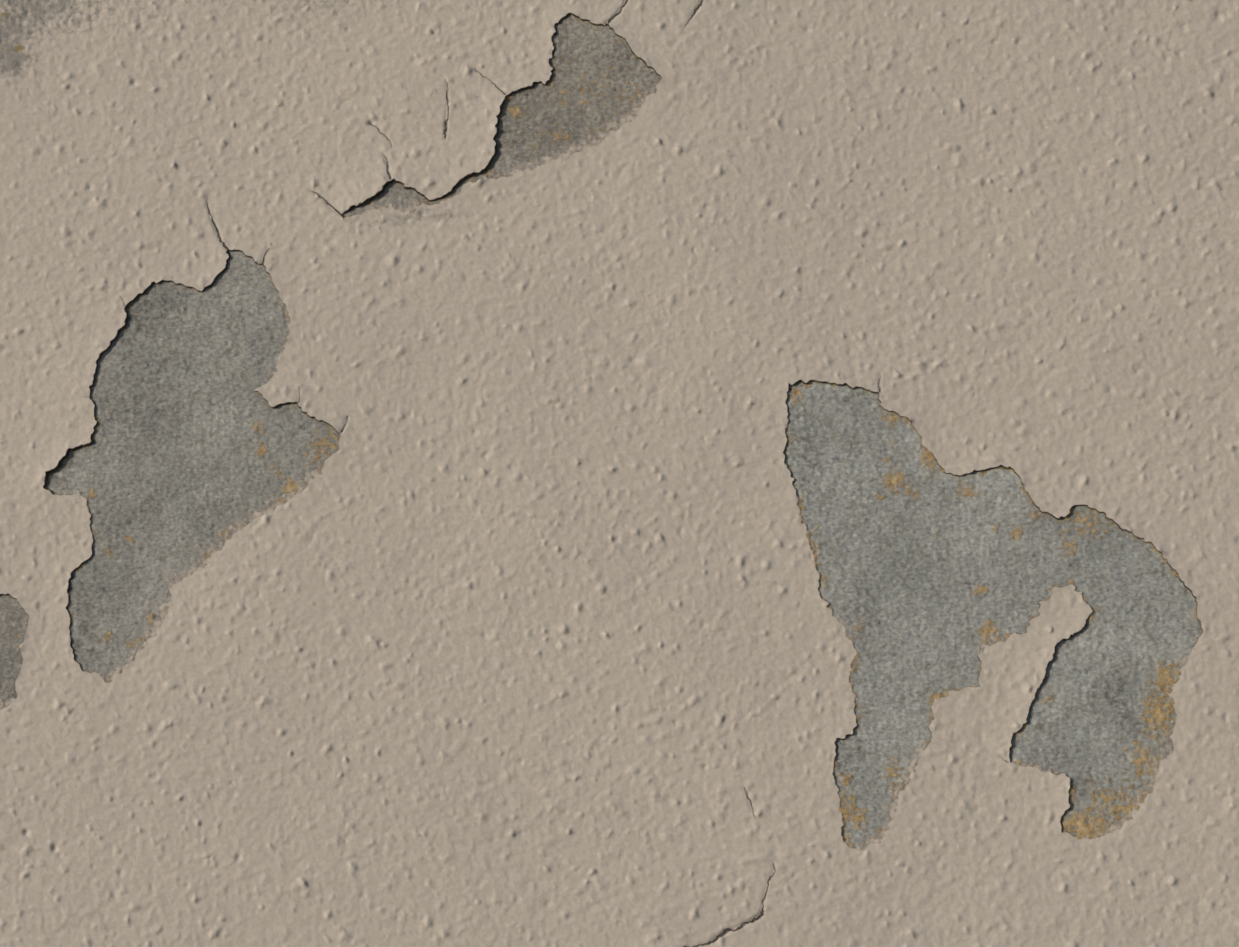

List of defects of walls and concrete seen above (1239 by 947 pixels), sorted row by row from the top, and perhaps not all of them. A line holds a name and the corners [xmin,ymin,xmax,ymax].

peeling [310,0,662,218]
peeling [43,200,346,683]
peeling [0,594,29,710]
peeling [783,378,1203,851]
crack [683,862,776,947]